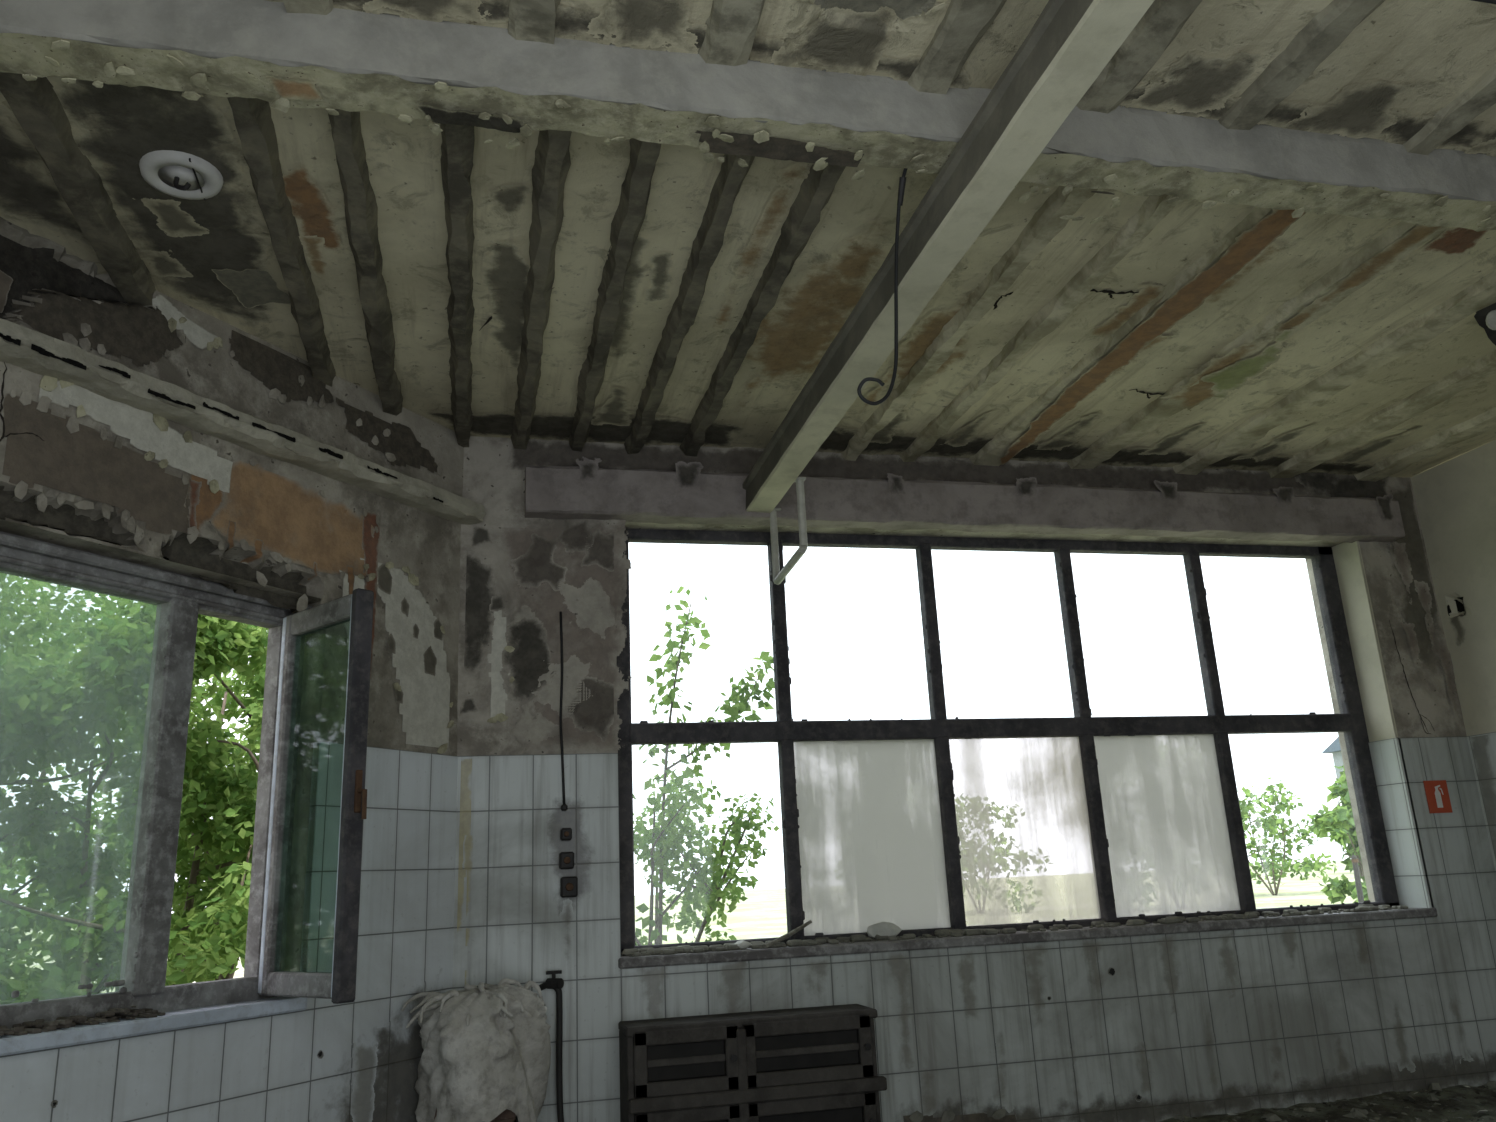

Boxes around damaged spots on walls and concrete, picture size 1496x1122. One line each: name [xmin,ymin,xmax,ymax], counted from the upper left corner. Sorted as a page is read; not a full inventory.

peeling [800,0,946,21]
peeling [61,62,135,88]
spalling [398,81,531,149]
spalling [695,129,865,180]
peeling [256,571,268,587]
peeling [487,519,615,745]
damp [635,966,670,1019]
damp [716,961,750,1014]
damp [952,947,981,1023]
damp [1018,942,1048,1029]
damp [1155,933,1183,1016]
damp [885,951,938,1116]